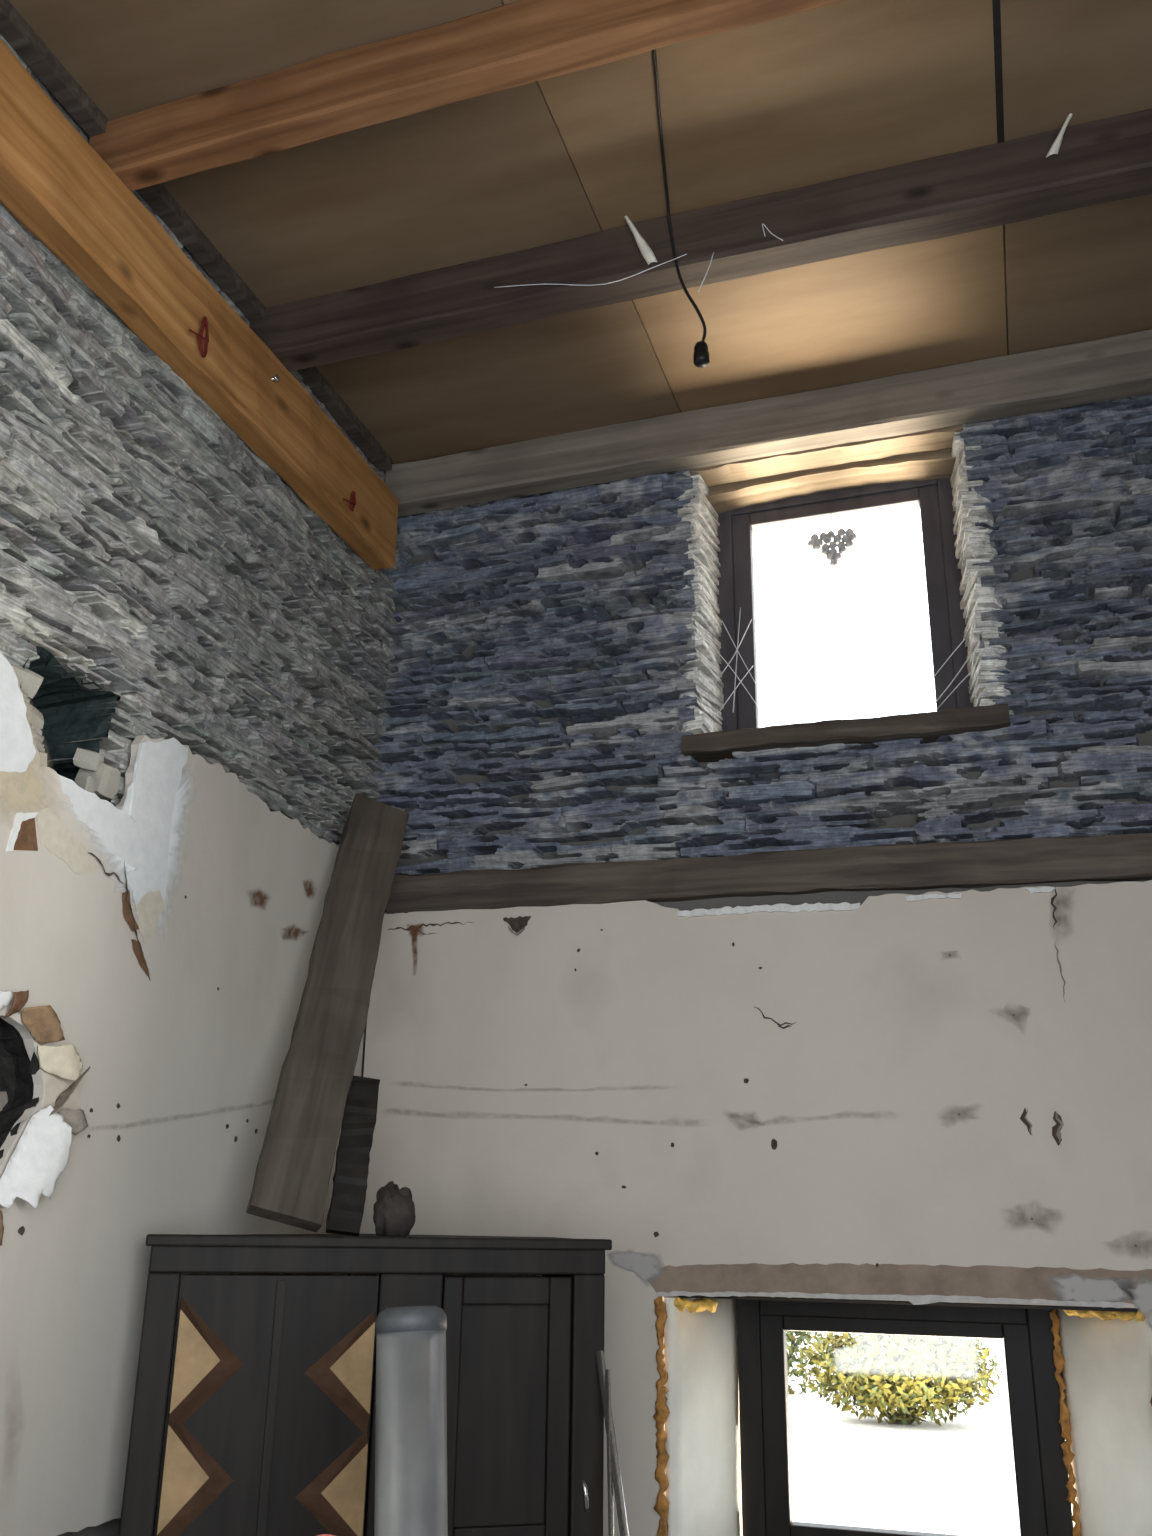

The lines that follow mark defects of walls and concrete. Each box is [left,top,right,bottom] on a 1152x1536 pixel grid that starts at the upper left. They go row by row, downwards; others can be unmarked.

spalling [0,640,121,875]
spalling [0,990,93,1246]
flaking render [648,1263,1152,1308]